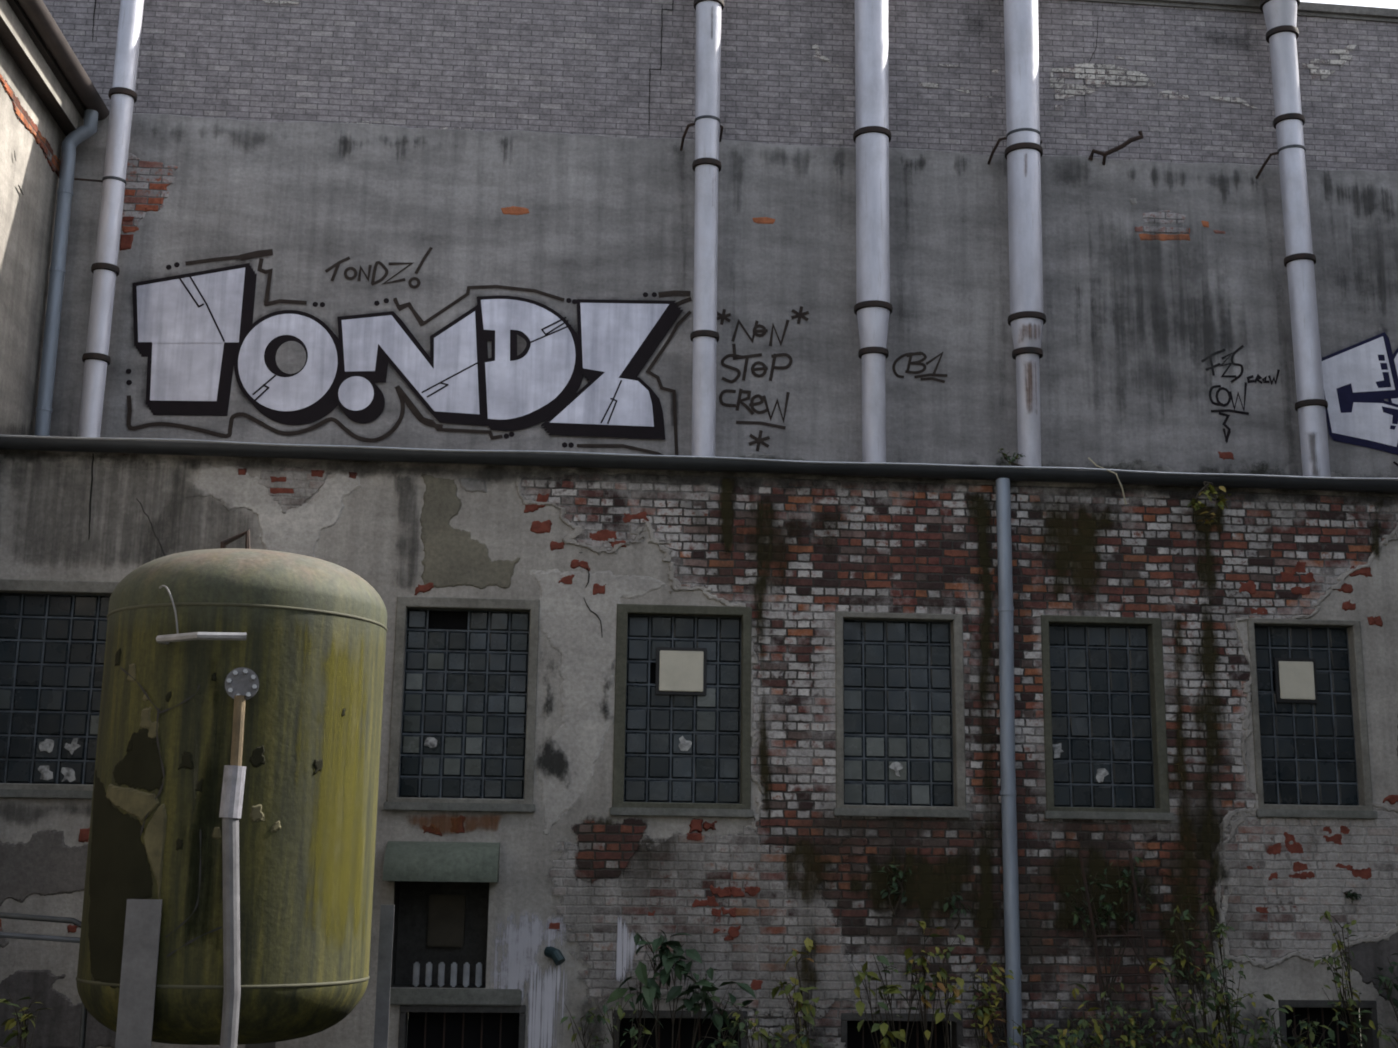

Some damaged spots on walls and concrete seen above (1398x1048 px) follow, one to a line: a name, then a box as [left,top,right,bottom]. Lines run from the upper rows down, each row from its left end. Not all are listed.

flaking render [0,74,61,177]
flaking render [120,152,178,251]
leakage [1324,177,1390,215]
flaking render [186,463,362,558]
flaking render [414,583,434,595]
flaking render [515,453,1398,1048]